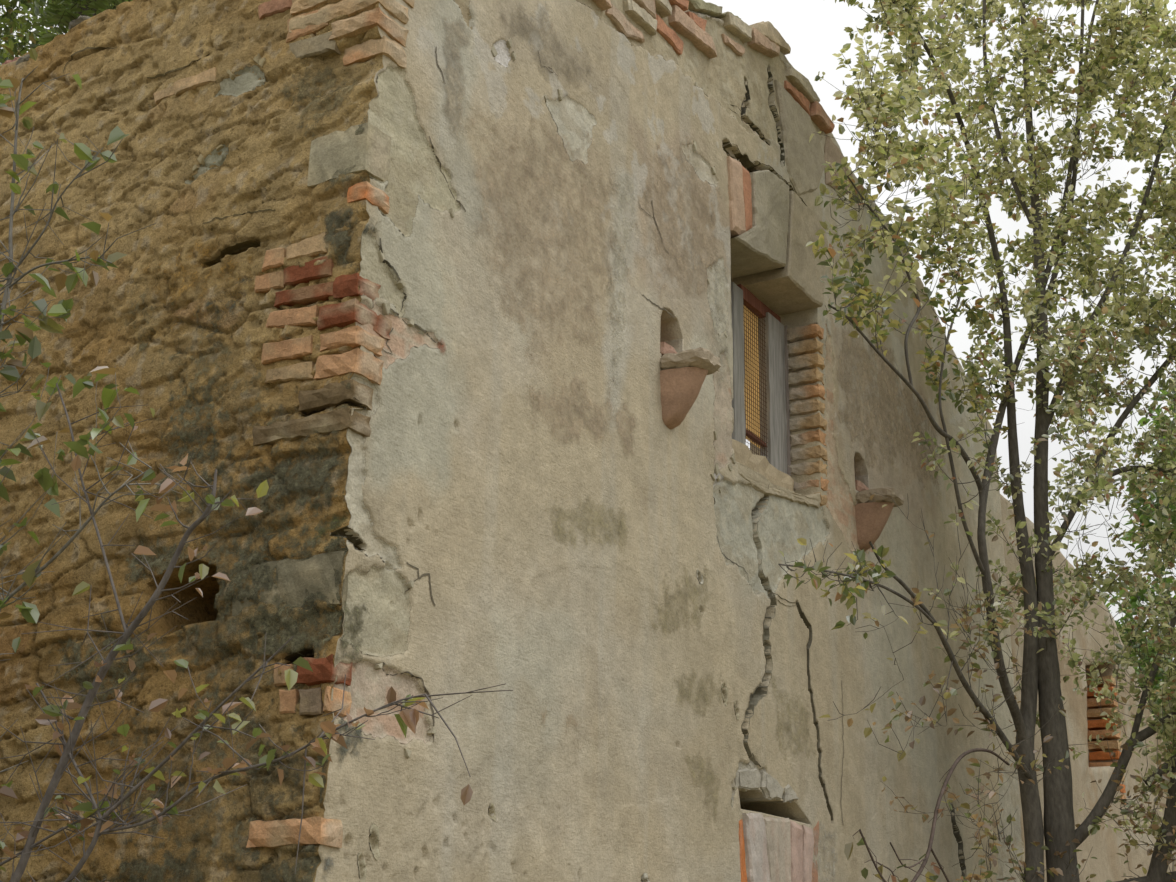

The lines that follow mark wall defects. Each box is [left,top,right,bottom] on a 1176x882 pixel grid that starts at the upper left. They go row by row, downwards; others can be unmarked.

spalling [356,66,461,369]
crack [722,68,807,206]
spalling [331,428,436,759]
crack [717,486,844,821]